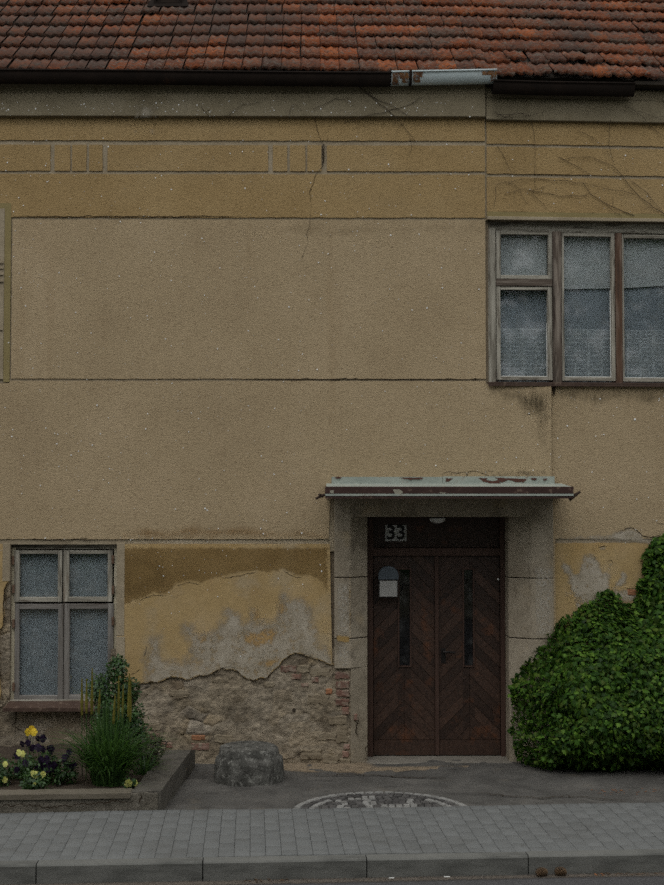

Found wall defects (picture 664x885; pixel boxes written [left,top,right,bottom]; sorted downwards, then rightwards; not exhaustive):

crack [302,120,325,257]
peeling [124,548,327,603]
peeling [562,529,653,620]
spalling [0,581,98,747]
spalling [120,593,358,764]